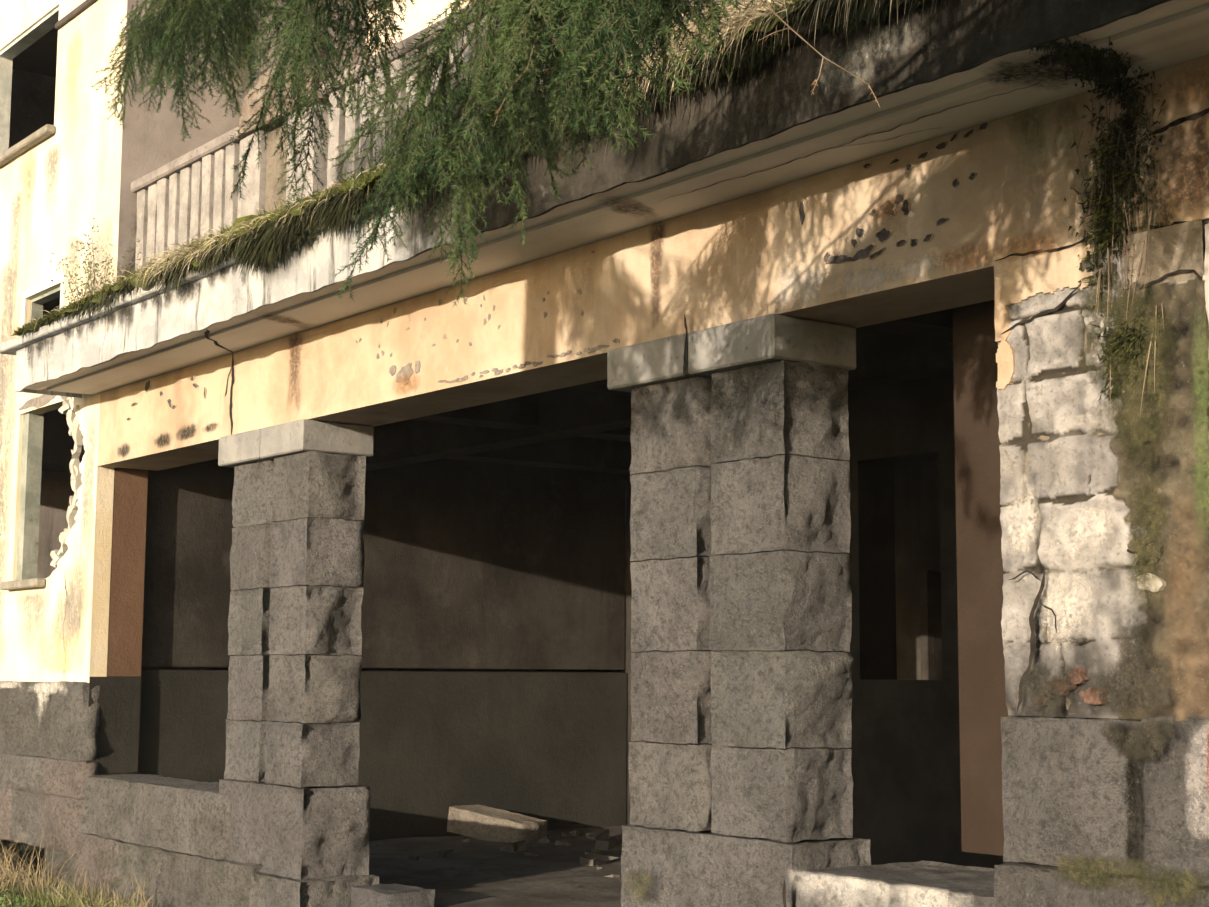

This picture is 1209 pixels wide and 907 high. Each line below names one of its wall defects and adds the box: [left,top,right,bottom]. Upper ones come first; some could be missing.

crack [1142,108,1209,139]
water stain [12,148,58,248]
water stain [652,222,663,315]
peeling [824,194,949,264]
water stain [0,265,244,489]
crack [204,329,234,435]
water stain [265,315,299,391]
spalling [376,344,421,386]
peeling [438,338,620,383]
flaking render [18,394,83,568]
water stain [34,571,82,705]
crack [1009,569,1057,711]